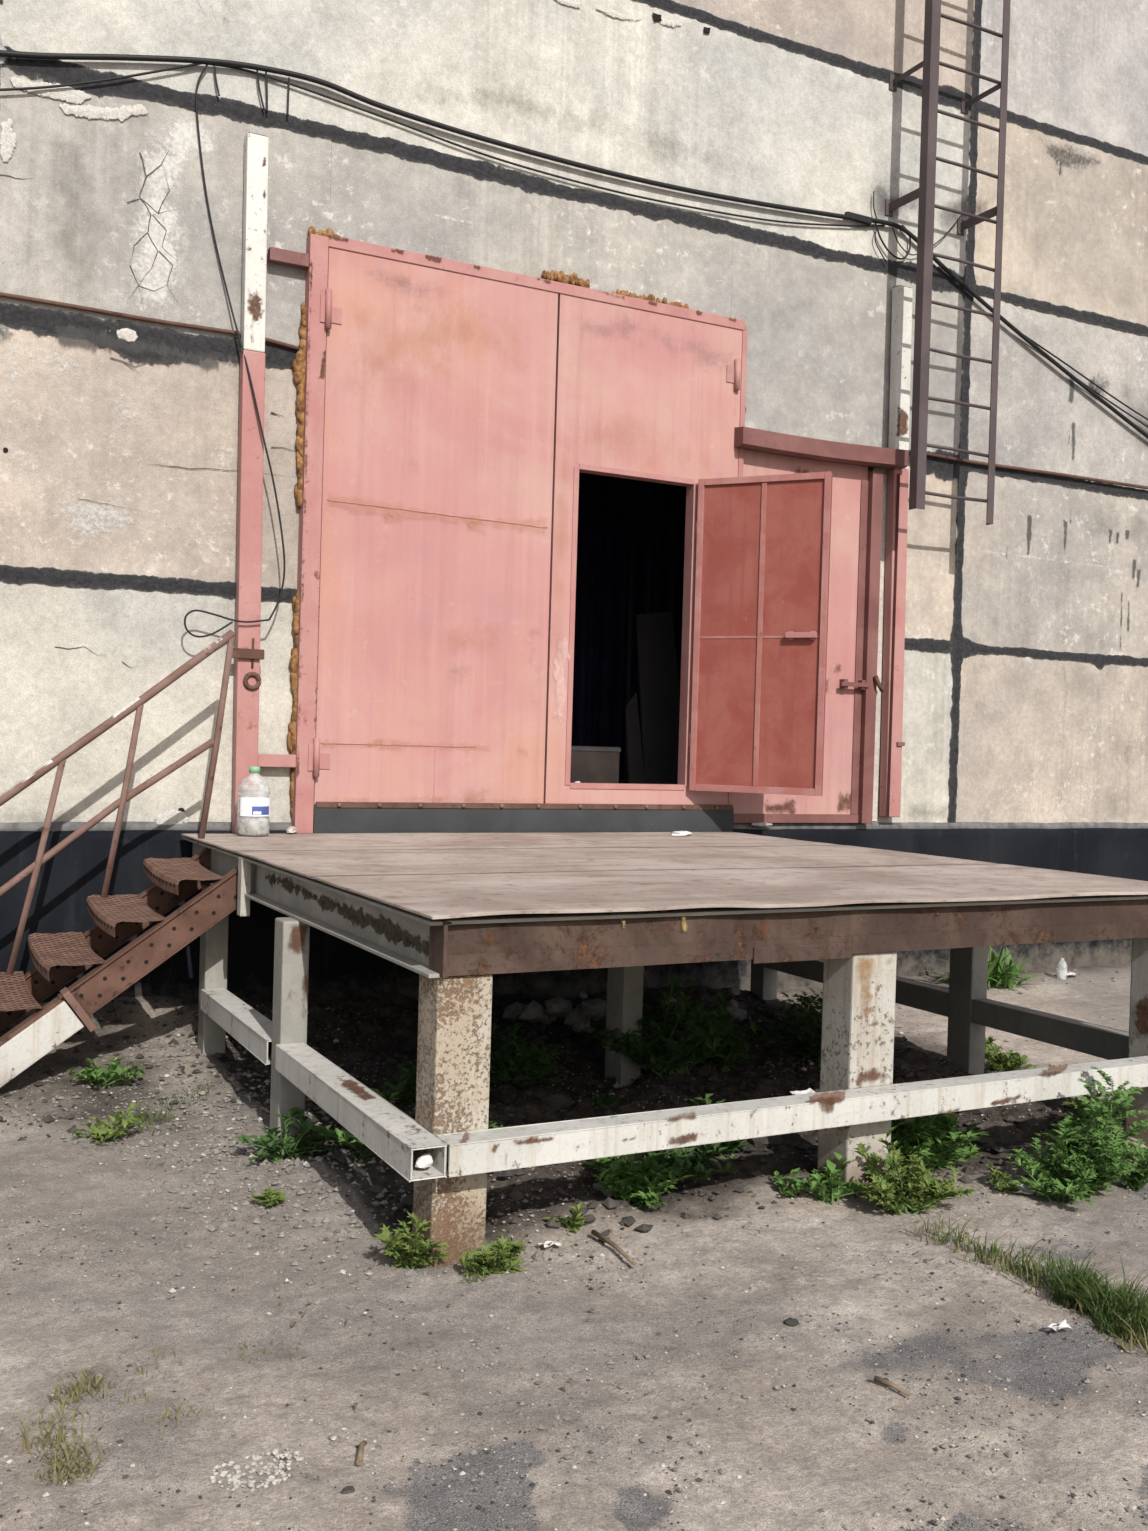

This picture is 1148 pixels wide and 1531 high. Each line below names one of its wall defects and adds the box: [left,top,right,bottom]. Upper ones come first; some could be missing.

spalling [10,76,149,121]
spalling [0,118,17,162]
crack [127,148,178,308]
rust [248,294,262,320]
rust [1134,995,1148,1036]
rust [342,1080,376,1100]
rust [809,1070,880,1112]